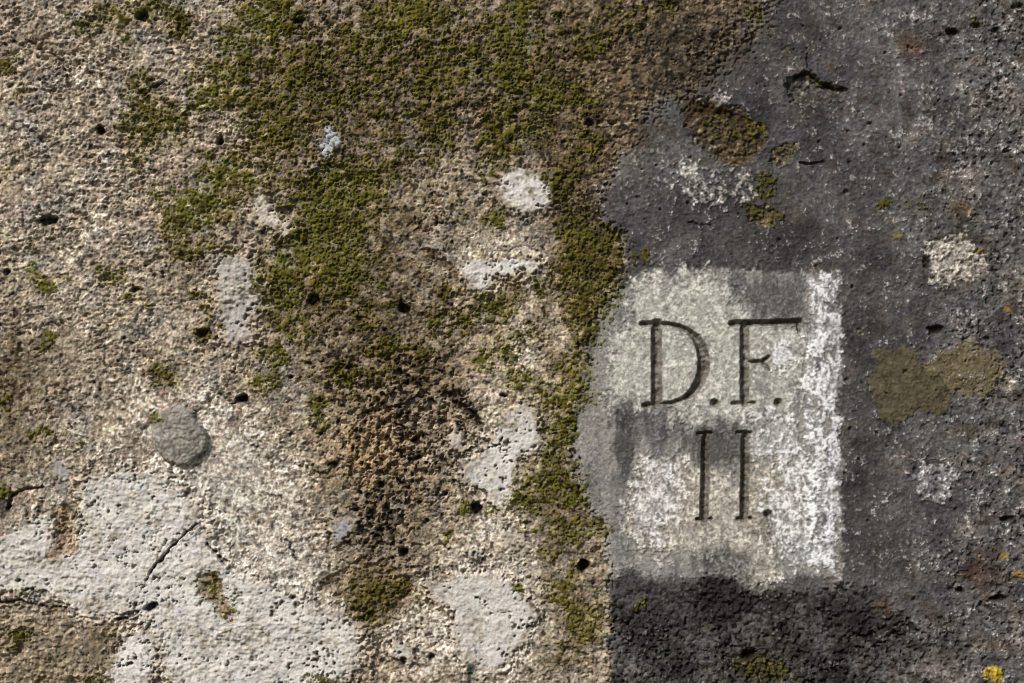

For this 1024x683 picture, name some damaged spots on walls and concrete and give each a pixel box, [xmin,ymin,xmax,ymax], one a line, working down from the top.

crack [115,523,229,622]